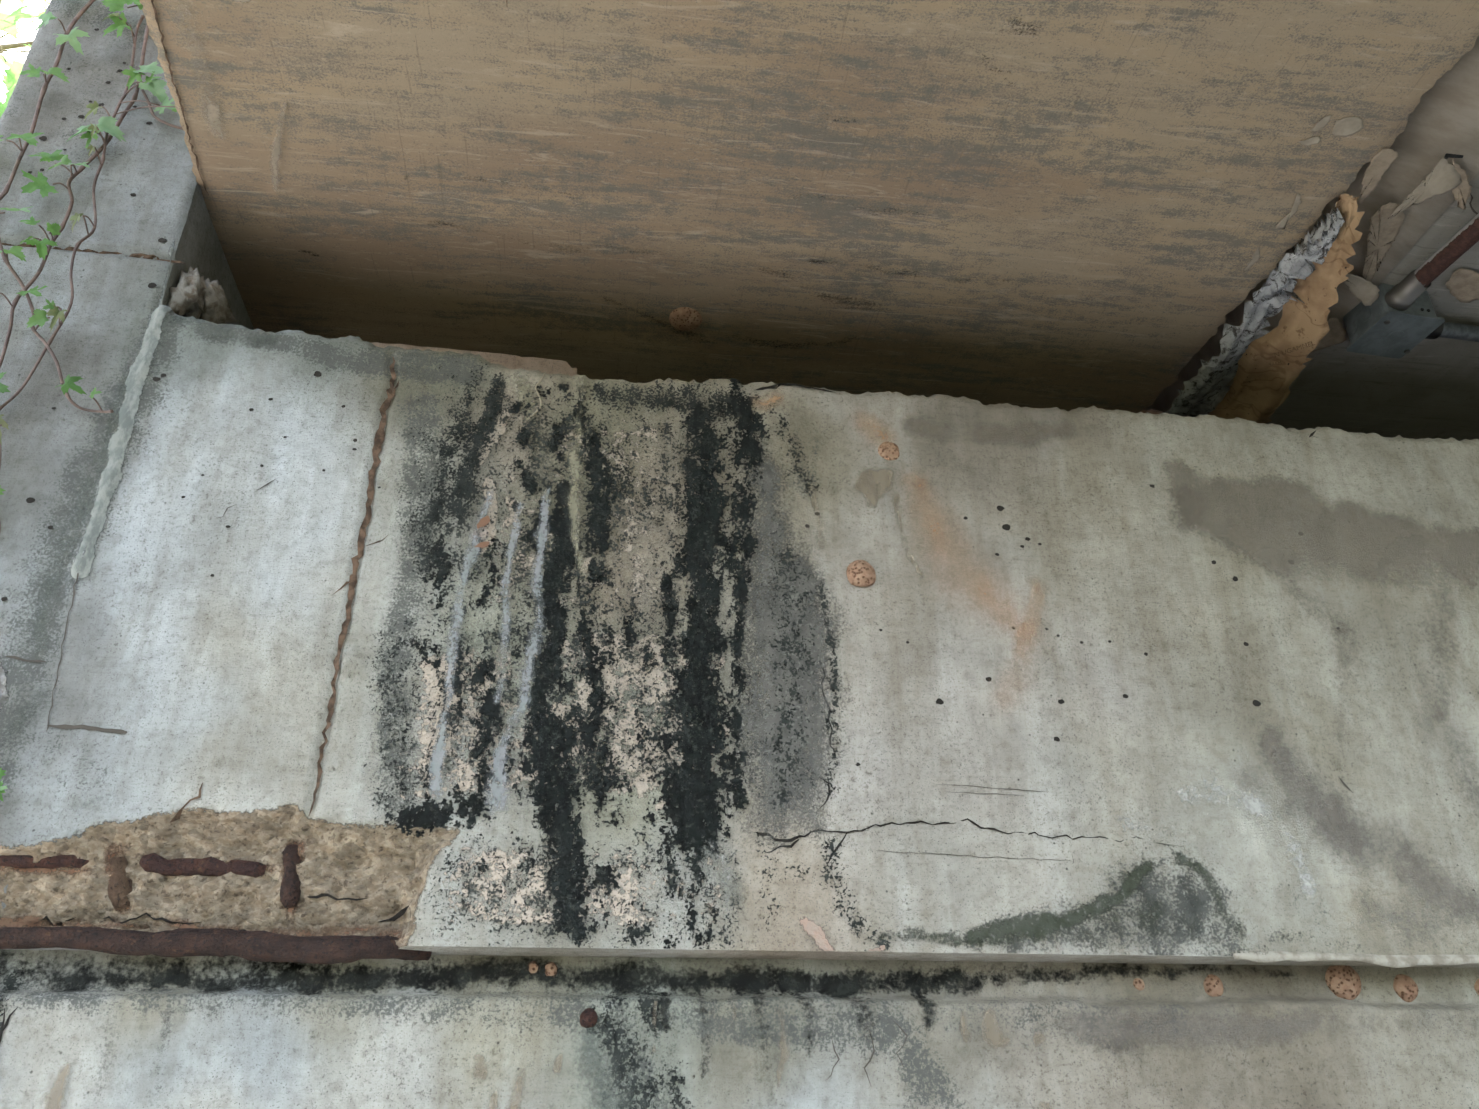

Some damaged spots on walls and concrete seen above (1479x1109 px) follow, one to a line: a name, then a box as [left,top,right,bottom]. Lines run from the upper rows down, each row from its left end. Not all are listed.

peeling [1344,148,1472,306]
peeling [547,420,663,608]
leakage [1168,463,1479,585]
spalling [47,724,127,734]
peeling [398,632,733,811]
leakage [0,360,1233,1052]
crack [756,662,1169,865]
corrosion [0,843,124,883]
corrosion [0,907,150,928]
spalling [0,804,723,949]
leakage [47,1064,69,1109]
leakage [650,1037,709,1109]